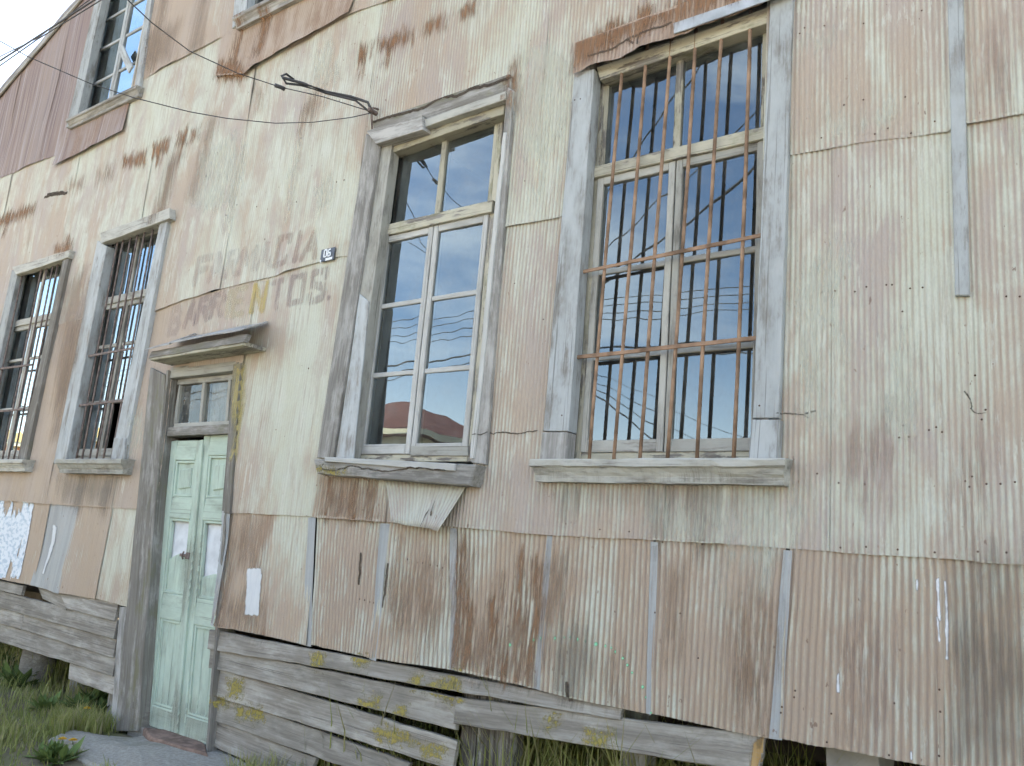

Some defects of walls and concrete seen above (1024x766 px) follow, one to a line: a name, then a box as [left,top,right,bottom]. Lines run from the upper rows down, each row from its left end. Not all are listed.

corrosion [216,13,245,82]
corrosion [253,6,273,55]
corrosion [358,13,441,67]
corrosion [460,0,476,20]
corrosion [573,0,716,75]
corrosion [123,126,196,167]
crack [472,428,537,436]
corrosion [452,542,473,668]
corrosion [486,552,543,687]